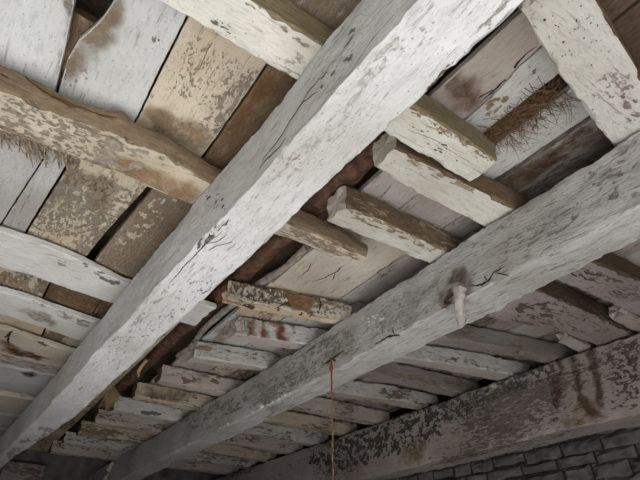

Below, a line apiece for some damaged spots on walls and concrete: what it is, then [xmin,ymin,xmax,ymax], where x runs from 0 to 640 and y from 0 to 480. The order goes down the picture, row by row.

leakage [65,0,118,44]
leakage [63,50,84,76]
peeling [168,35,258,135]
crack [259,14,394,169]
peeling [590,72,640,121]
peeling [0,96,149,171]
leakage [145,110,213,147]
crack [171,234,232,281]
peeling [230,282,289,305]
crack [471,266,510,286]
corrosion [273,322,287,341]
peeling [444,369,542,409]